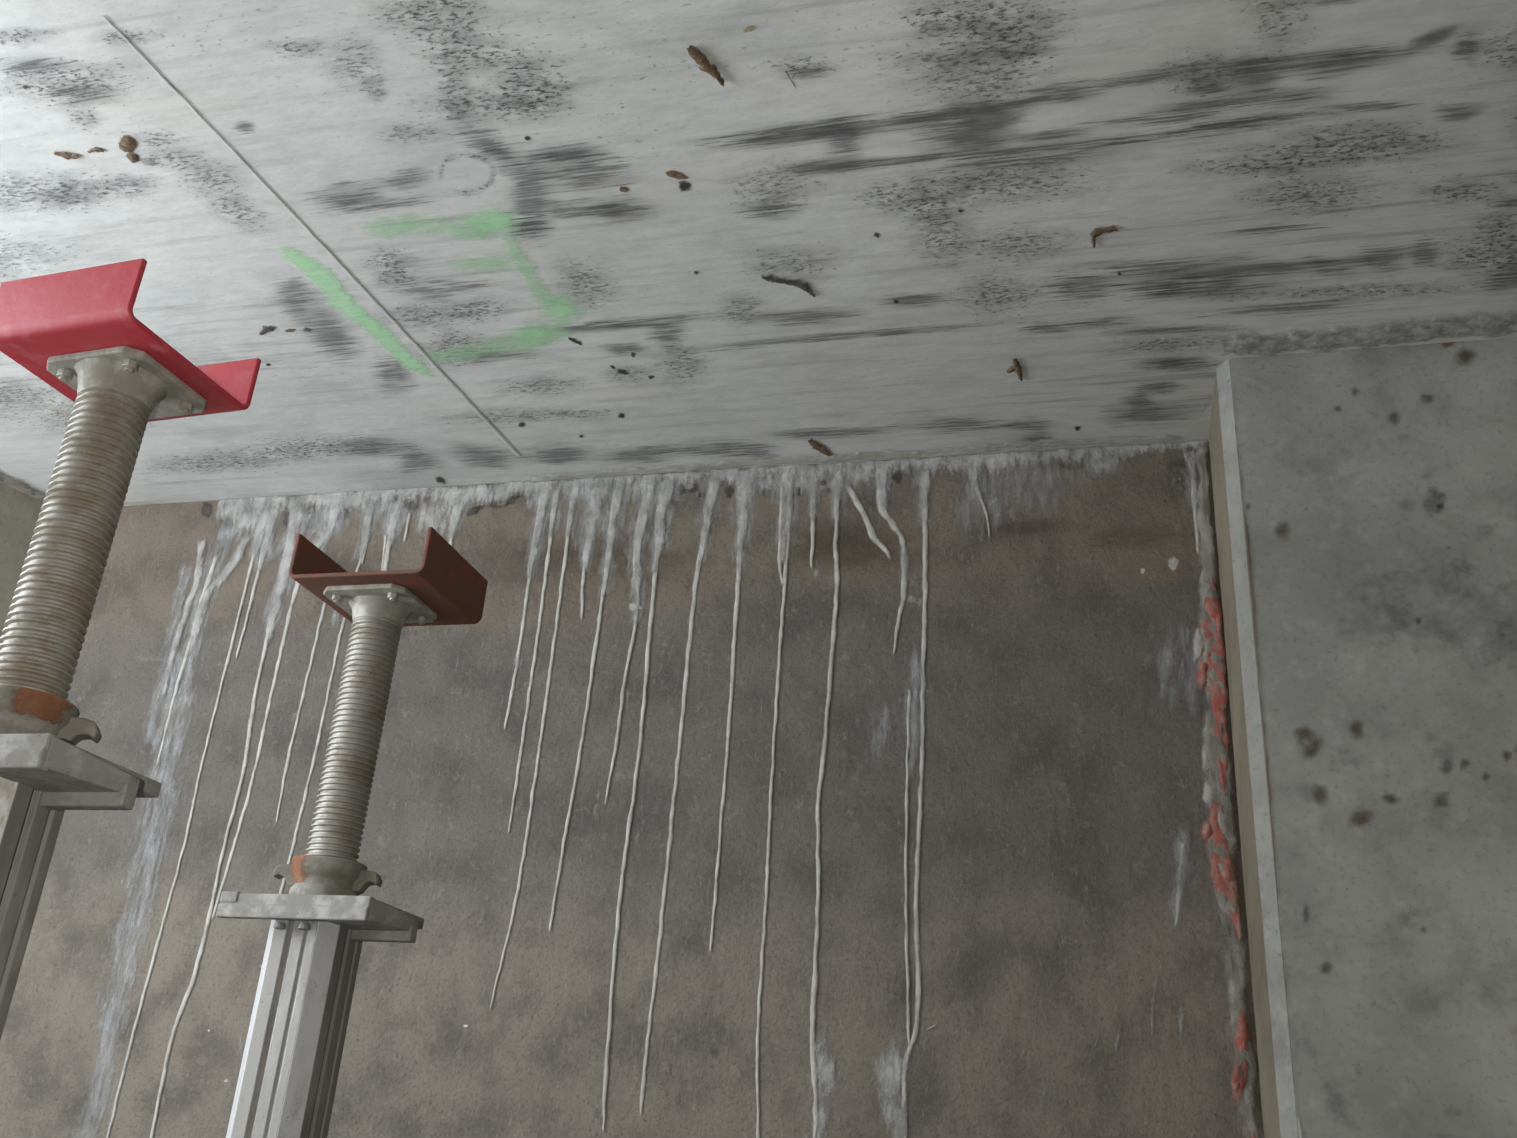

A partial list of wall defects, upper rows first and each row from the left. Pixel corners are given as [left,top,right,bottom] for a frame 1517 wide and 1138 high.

leakage [5,30,162,130]
leakage [0,132,263,230]
leakage [275,32,385,101]
leakage [306,169,427,210]
leakage [369,0,648,238]
leakage [702,0,1517,270]
leakage [106,176,1517,1138]